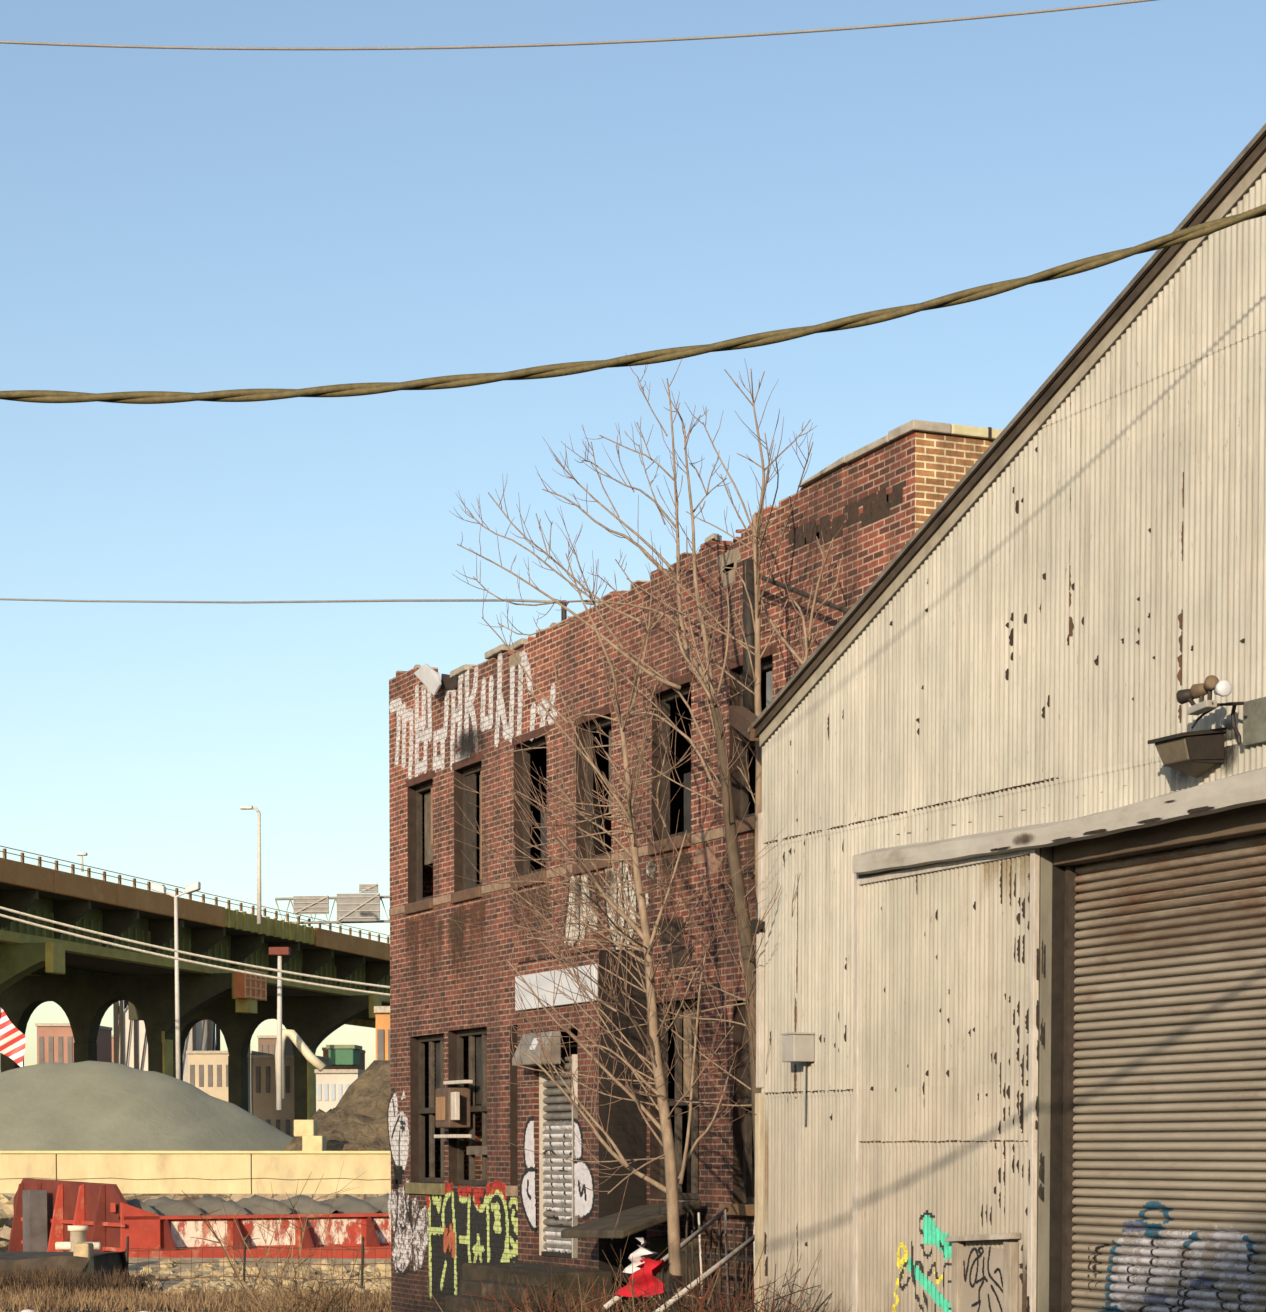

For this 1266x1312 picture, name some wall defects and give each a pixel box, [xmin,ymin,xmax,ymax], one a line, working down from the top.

peeling [1005,604,1041,680]
peeling [990,846,1043,980]
peeling [978,993,1043,1227]